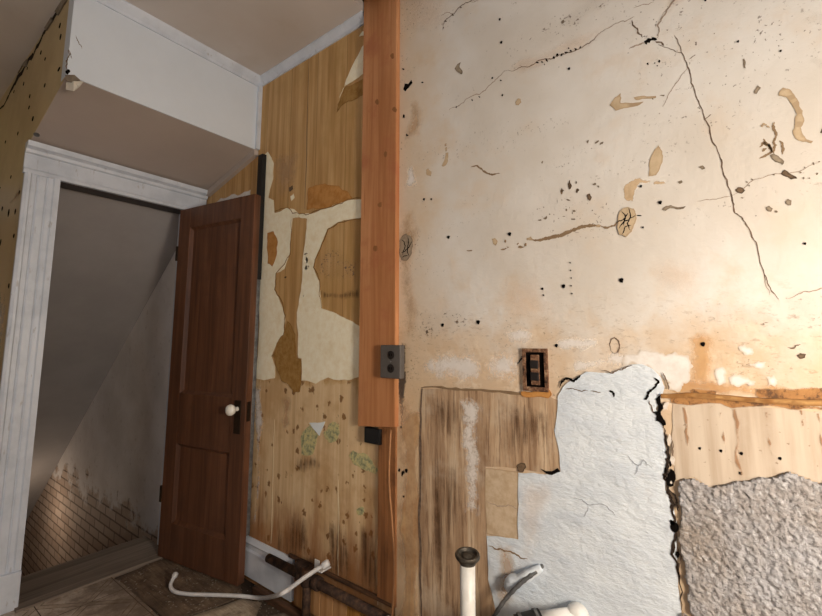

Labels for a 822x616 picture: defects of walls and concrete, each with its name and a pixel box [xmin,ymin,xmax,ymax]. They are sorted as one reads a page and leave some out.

crack [0,0,67,109]
crack [449,17,633,110]
peeling [492,146,664,250]
crack [660,35,822,299]
peeling [778,88,813,143]
damp [435,490,449,571]
damp [461,401,478,507]
peeling [418,364,822,616]